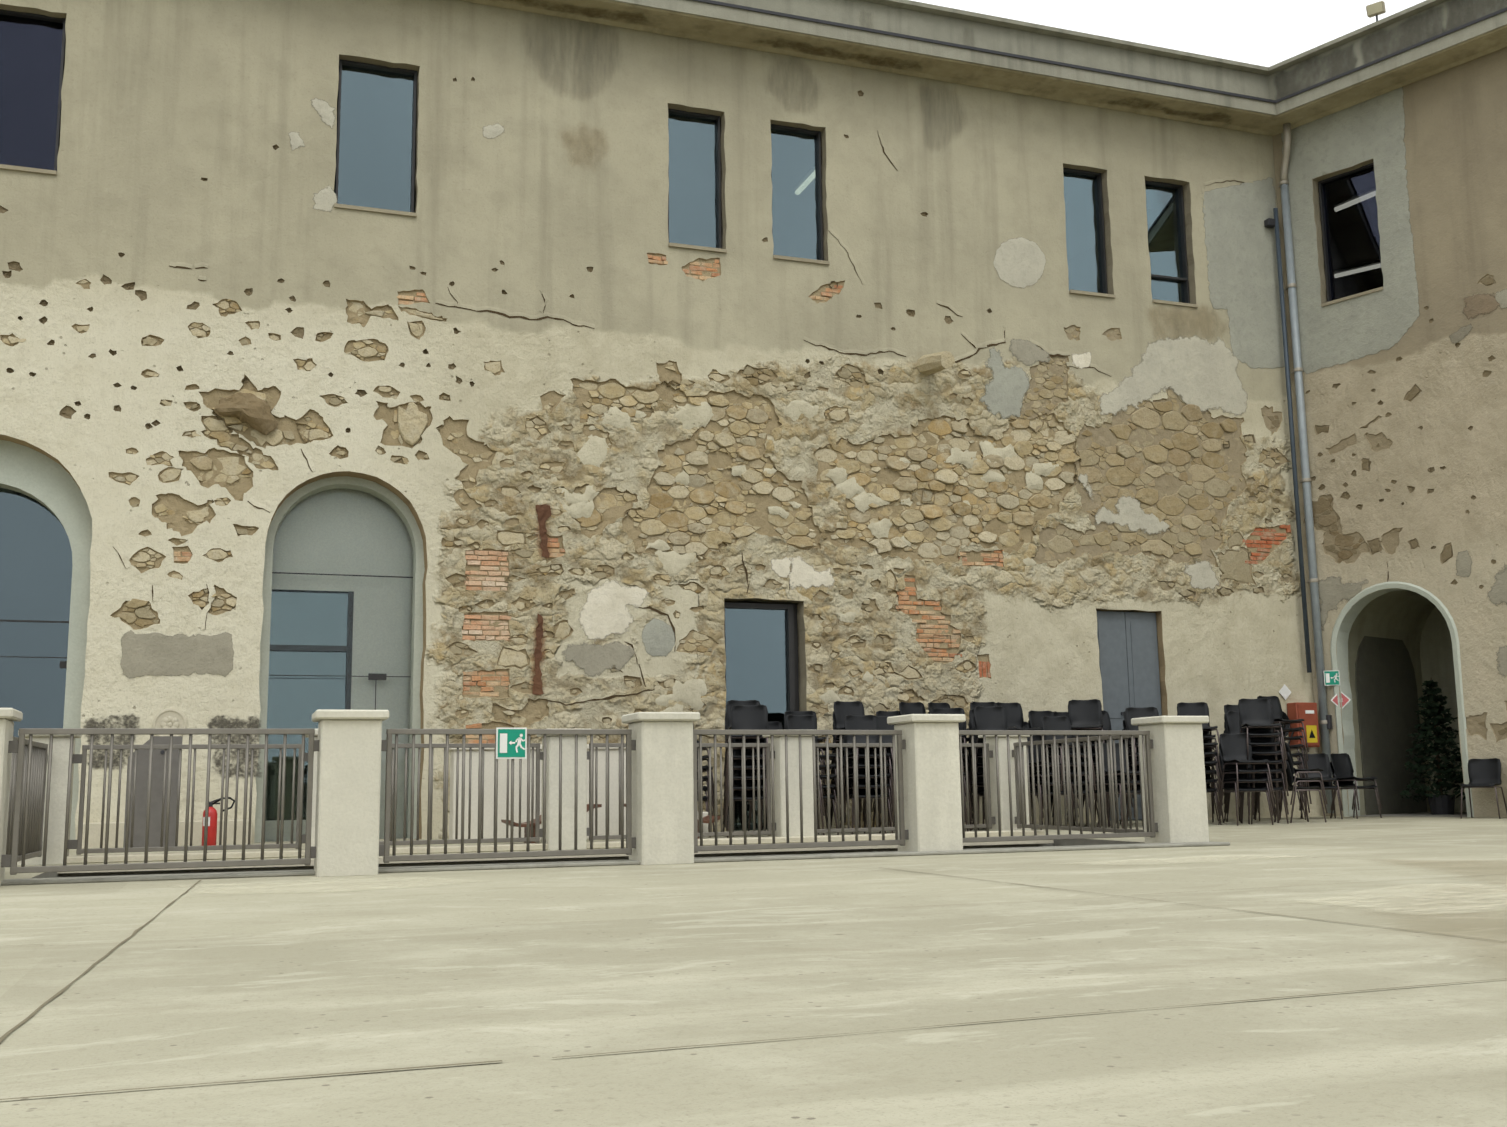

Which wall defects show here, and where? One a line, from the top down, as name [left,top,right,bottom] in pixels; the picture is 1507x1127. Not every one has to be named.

crack [877,130,900,171]
flaking render [0,300,55,346]
flaking render [71,307,93,334]
flaking render [76,274,147,301]
crack [435,286,595,329]
flaking render [647,253,721,281]
crack [828,229,866,284]
flaking render [59,401,90,420]
flaking render [108,266,1453,753]